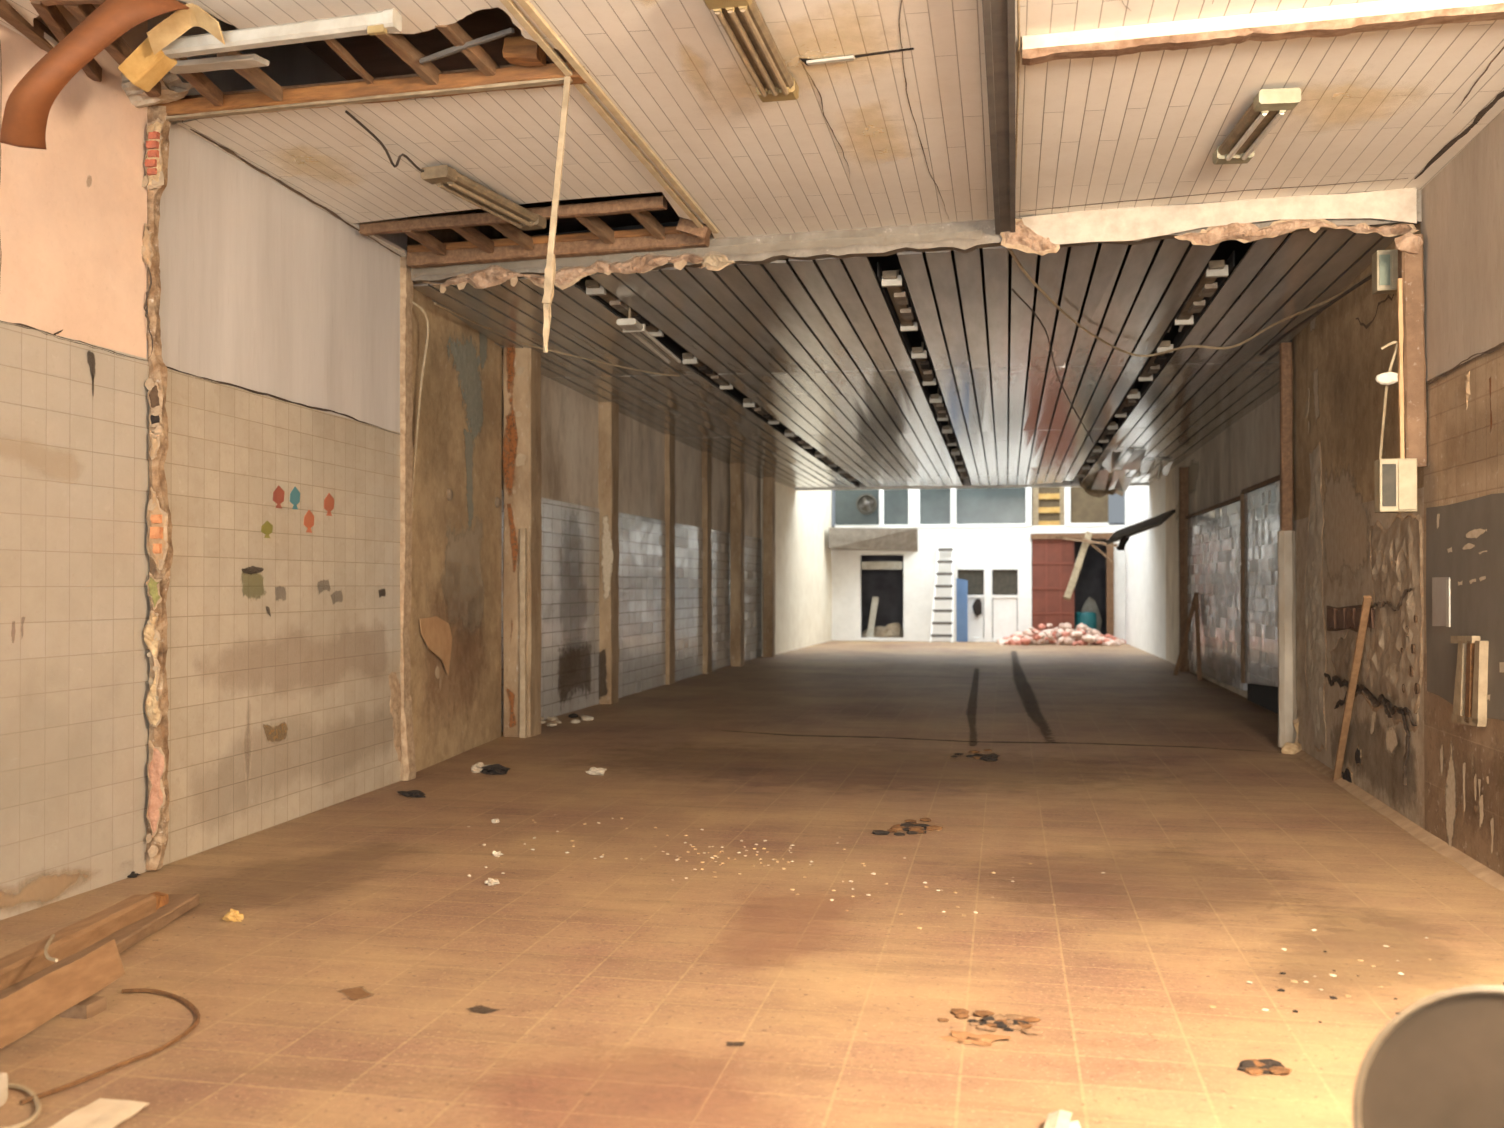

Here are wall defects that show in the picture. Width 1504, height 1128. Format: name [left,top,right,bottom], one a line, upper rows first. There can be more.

spalling [142,118,164,189]
flaking render [141,223,153,268]
spalling [145,378,164,460]
spalling [146,487,168,574]
crack [1371,588,1412,611]
crack [1324,673,1417,785]
peeling [1474,774,1489,824]